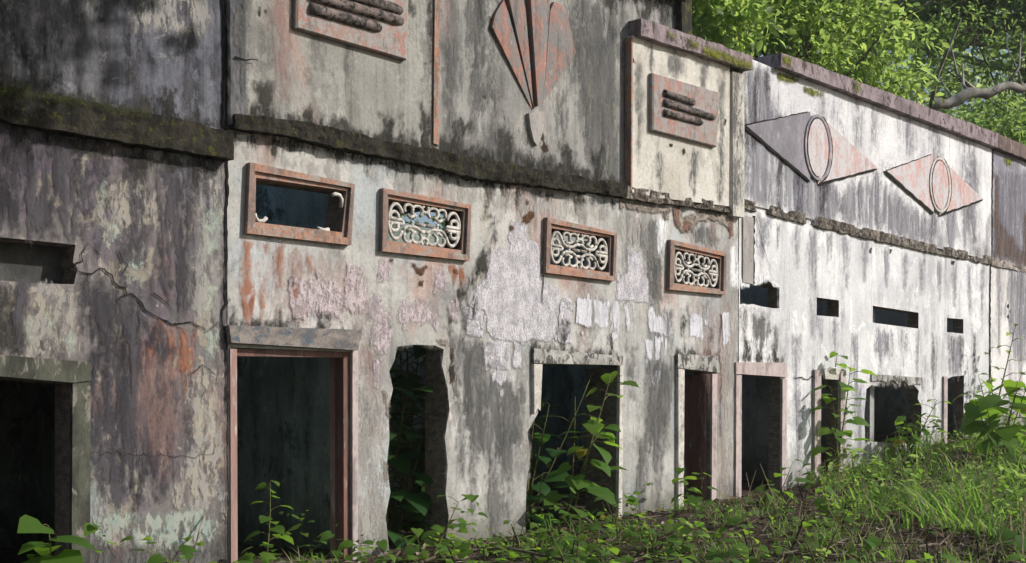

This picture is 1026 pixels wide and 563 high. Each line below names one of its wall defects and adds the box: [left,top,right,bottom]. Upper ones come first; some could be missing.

crack [71,161,229,554]
corrosion [241,239,311,324]
water stain [0,0,676,553]
peeling [288,162,777,483]
water stain [669,50,684,77]
water stain [689,150,699,195]
water stain [717,66,977,287]
water stain [885,161,1026,370]